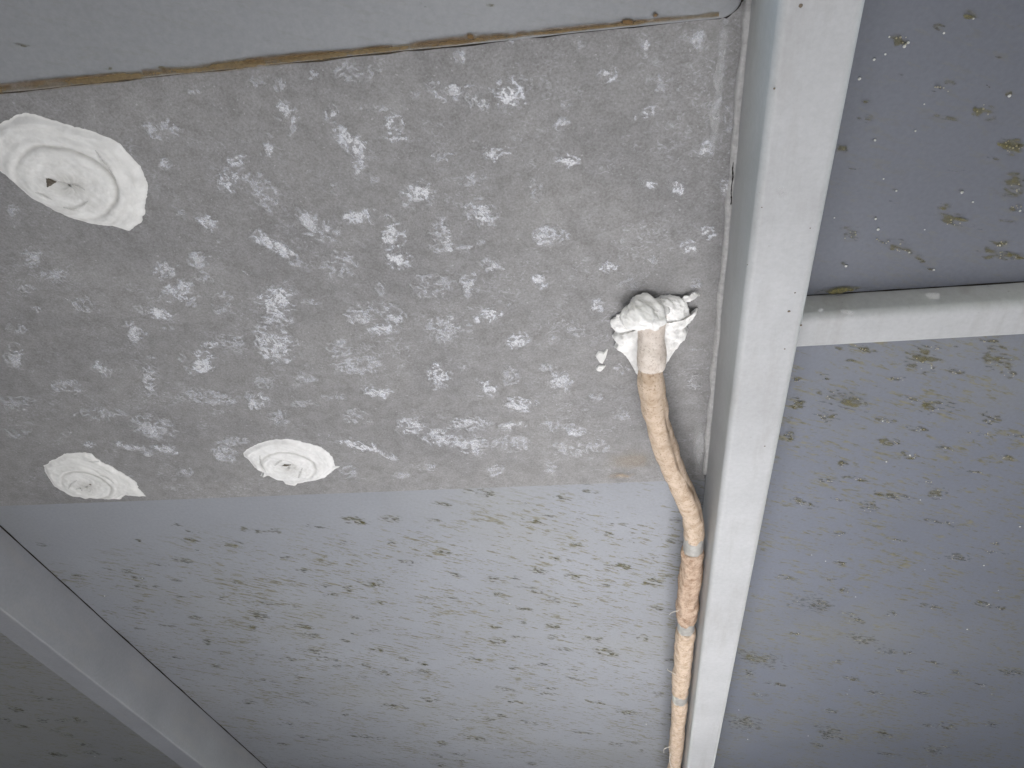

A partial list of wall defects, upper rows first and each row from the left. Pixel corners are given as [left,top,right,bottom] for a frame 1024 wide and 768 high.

leakage [434,80,526,108]
leakage [325,111,367,174]
leakage [402,185,430,206]
leakage [343,209,371,223]
leakage [252,230,295,265]
leakage [382,215,409,270]
leakage [148,265,193,319]
leakage [256,288,292,363]
leakage [345,305,403,335]
leakage [190,342,218,373]
leakage [340,440,396,460]
leakage [398,418,490,454]